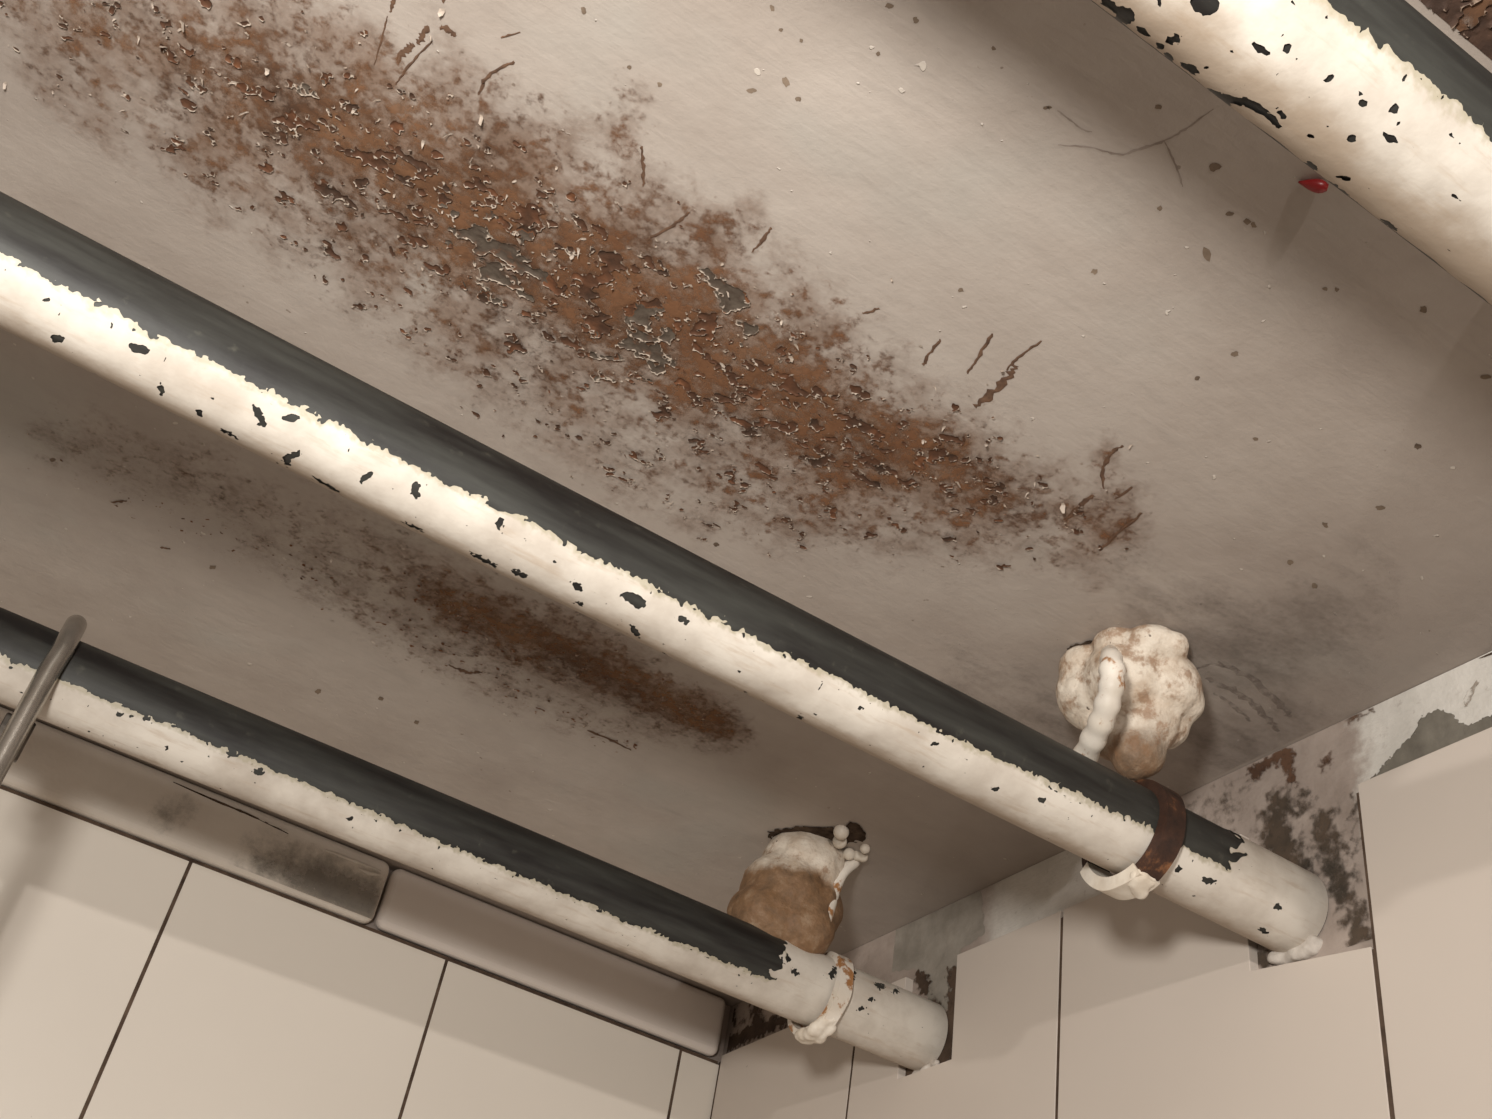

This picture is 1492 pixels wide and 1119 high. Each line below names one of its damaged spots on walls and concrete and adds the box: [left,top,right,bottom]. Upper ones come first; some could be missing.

rust [42,0,1143,561]
rust [60,459,741,753]
peeling [1370,709,1492,779]
damp [1257,789,1372,947]
damp [1257,949,1274,968]